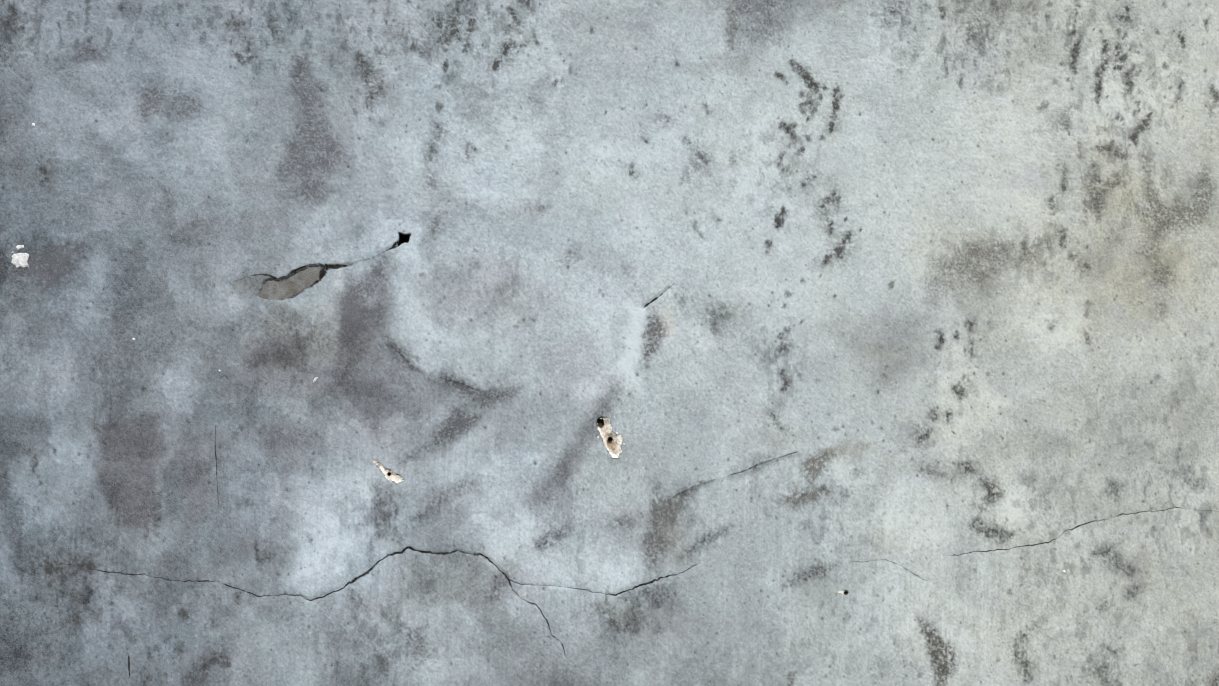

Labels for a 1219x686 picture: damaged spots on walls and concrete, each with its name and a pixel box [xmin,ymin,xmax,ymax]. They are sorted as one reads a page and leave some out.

damp [776,60,842,152]
damp [824,217,862,264]
spalling [242,265,326,300]
spalling [597,418,625,458]
spalling [371,459,404,484]
crack [954,507,1209,556]
crack [70,546,696,657]